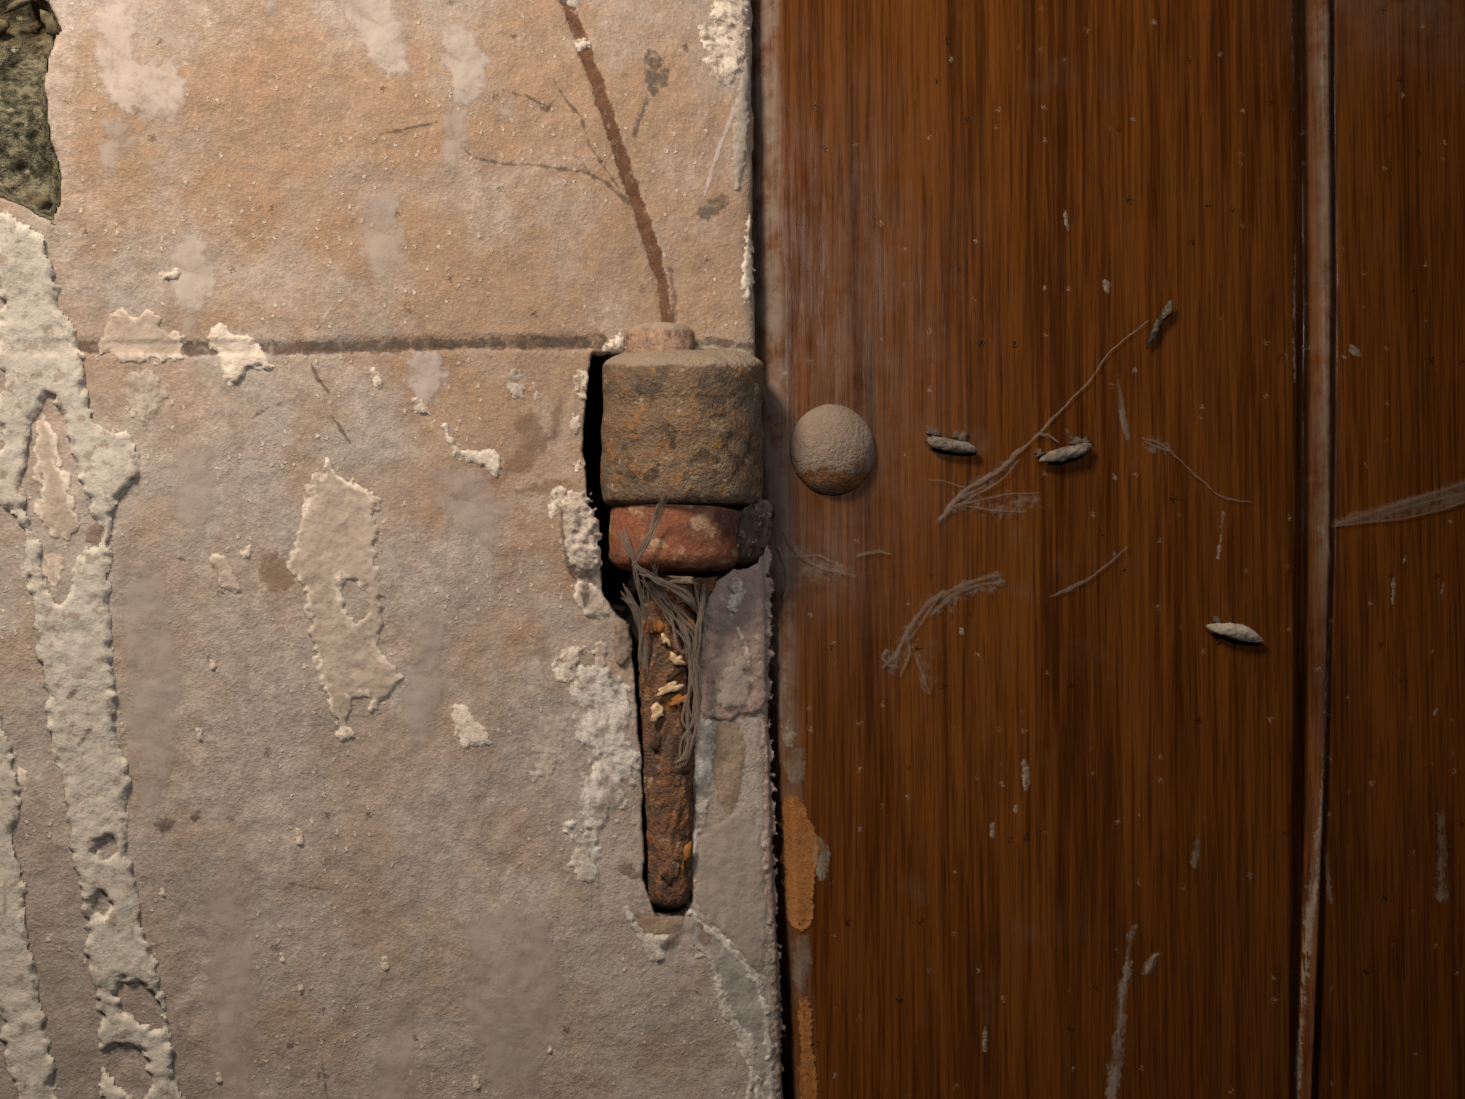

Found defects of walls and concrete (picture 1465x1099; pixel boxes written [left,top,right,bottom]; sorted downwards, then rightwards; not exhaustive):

spalling [0,0,61,223]
leakage [161,233,217,335]
crack [78,341,99,353]
crack [183,341,218,357]
crack [259,335,608,391]
leakage [32,414,79,591]
leakage [17,766,30,791]
leakage [530,665,641,886]